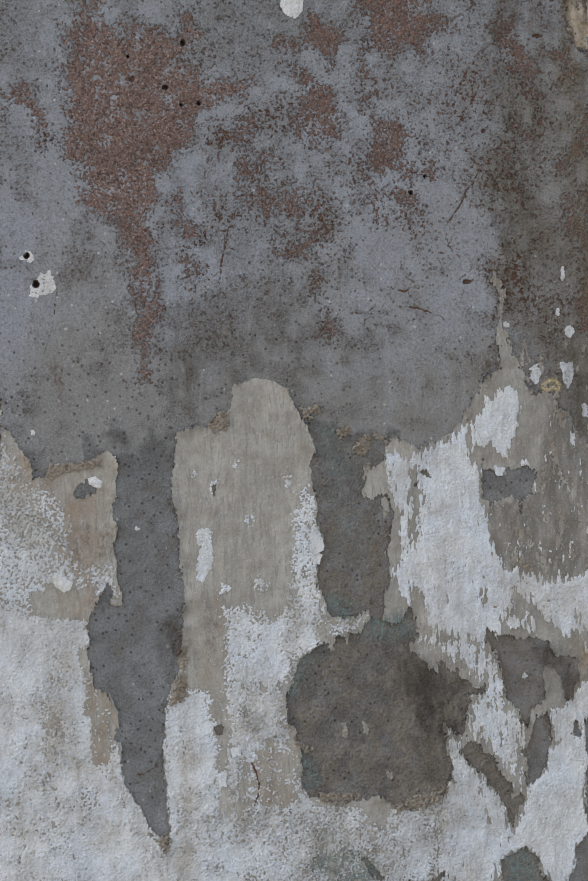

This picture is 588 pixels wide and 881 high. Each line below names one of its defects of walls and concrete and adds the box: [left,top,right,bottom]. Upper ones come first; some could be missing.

spalling [0,0,588,400]
peeling [0,270,588,881]